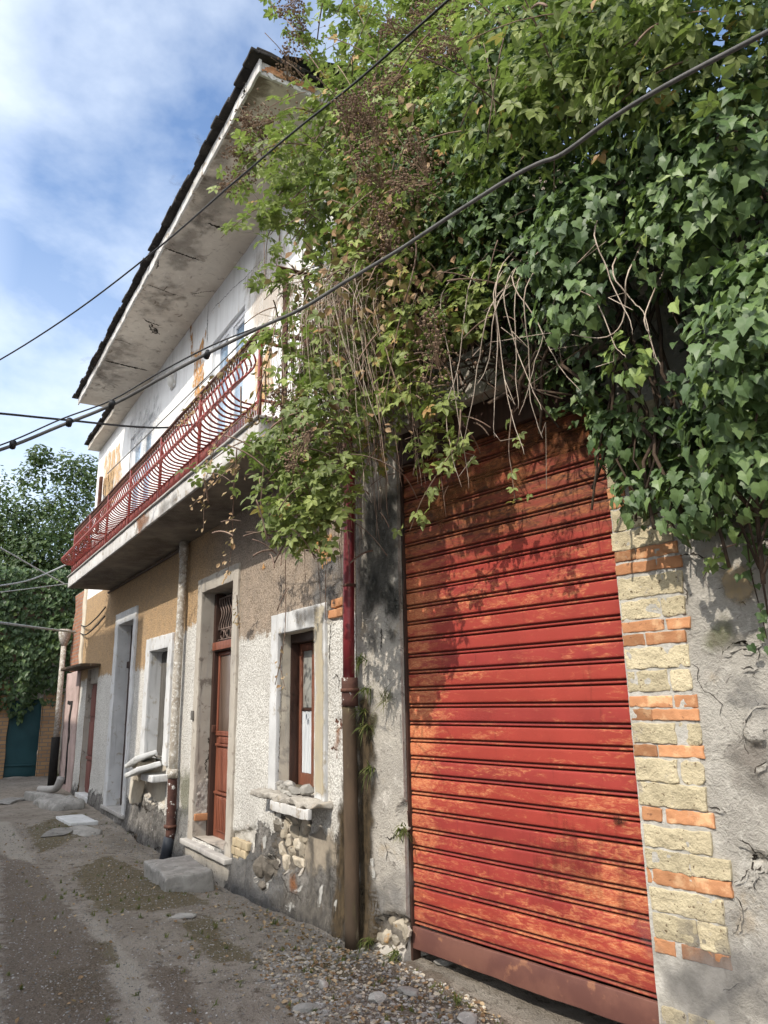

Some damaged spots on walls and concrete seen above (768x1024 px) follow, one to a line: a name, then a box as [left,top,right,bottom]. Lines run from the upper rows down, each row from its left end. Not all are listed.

peeling [190,325,207,395]
peeling [102,443,122,503]
water stain [359,491,403,615]
crack [694,640,767,775]
flaking render [231,824,256,859]
crack [733,840,768,934]
spalling [373,910,413,957]